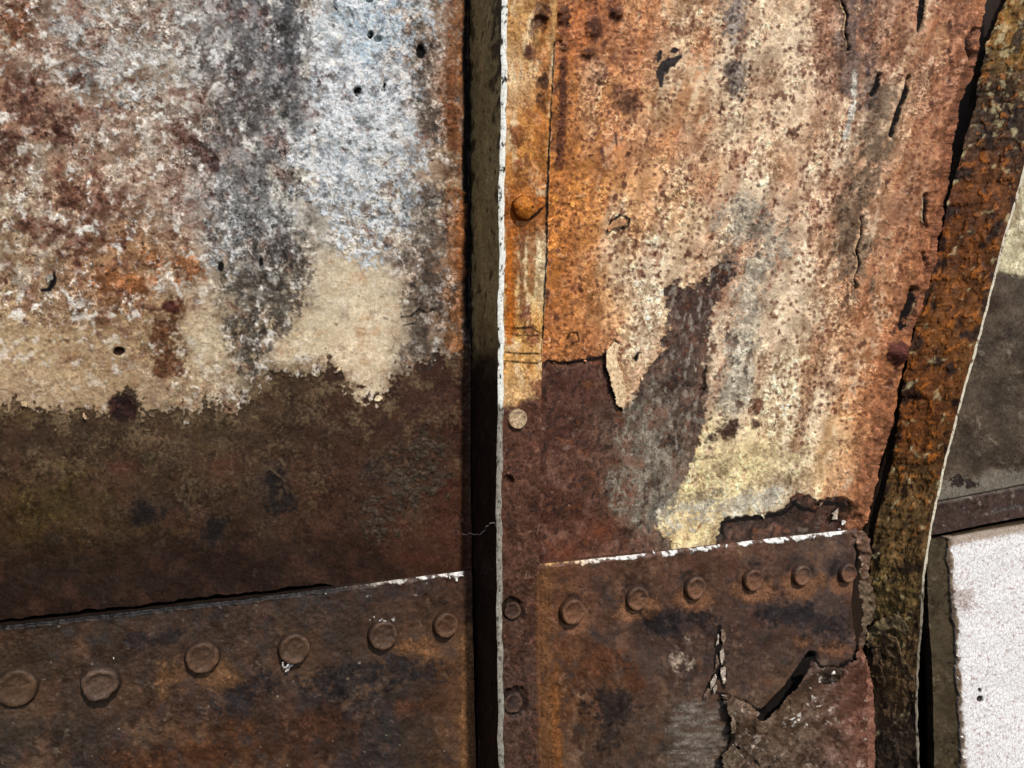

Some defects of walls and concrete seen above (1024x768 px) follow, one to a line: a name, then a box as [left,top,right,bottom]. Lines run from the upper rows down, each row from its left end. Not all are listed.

crack [916,0,928,33]
crack [964,30,974,60]
crack [870,73,912,137]
damp [49,0,448,376]
rust [505,0,601,360]
rust [18,181,206,379]
crack [898,255,926,331]
rust [108,393,139,422]
rust [706,398,764,441]
rust [717,137,946,768]
peeling [501,262,736,768]
peeling [716,493,859,547]